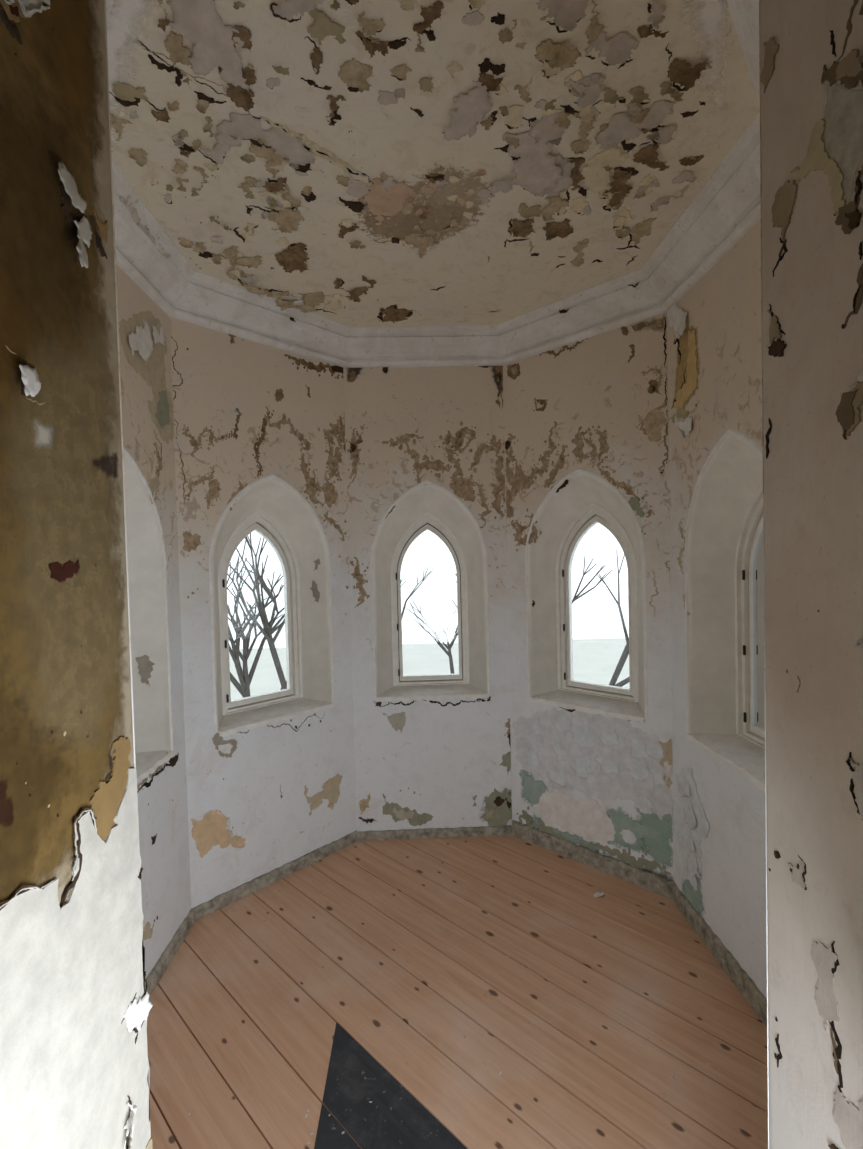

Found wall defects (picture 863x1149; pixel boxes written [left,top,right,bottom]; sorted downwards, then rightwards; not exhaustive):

peeling [109,0,444,322]
leakage [358,166,494,258]
peeling [401,0,713,268]
leakage [0,0,149,904]
peeling [382,417,655,551]
peeling [835,367,863,440]
spalling [191,809,246,858]
spalling [359,787,433,826]
spalling [472,788,512,826]
peeling [513,705,710,891]
peeling [0,736,179,1149]
crack [774,1017,782,1067]